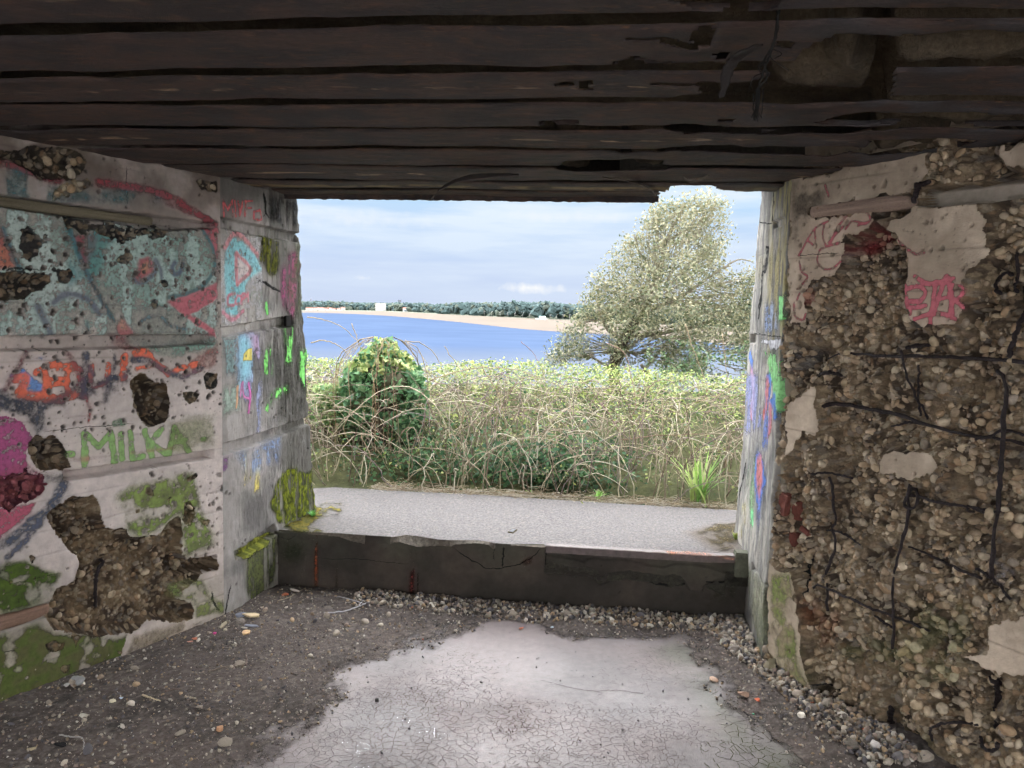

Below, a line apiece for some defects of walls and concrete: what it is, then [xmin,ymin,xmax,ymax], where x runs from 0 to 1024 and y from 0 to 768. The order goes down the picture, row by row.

spalling [0,145,91,201]
spalling [0,226,73,301]
spalling [130,373,170,427]
spalling [0,435,71,512]
spalling [769,126,1024,768]
spalling [44,495,219,652]
crack [453,547,547,569]
crack [240,638,805,768]